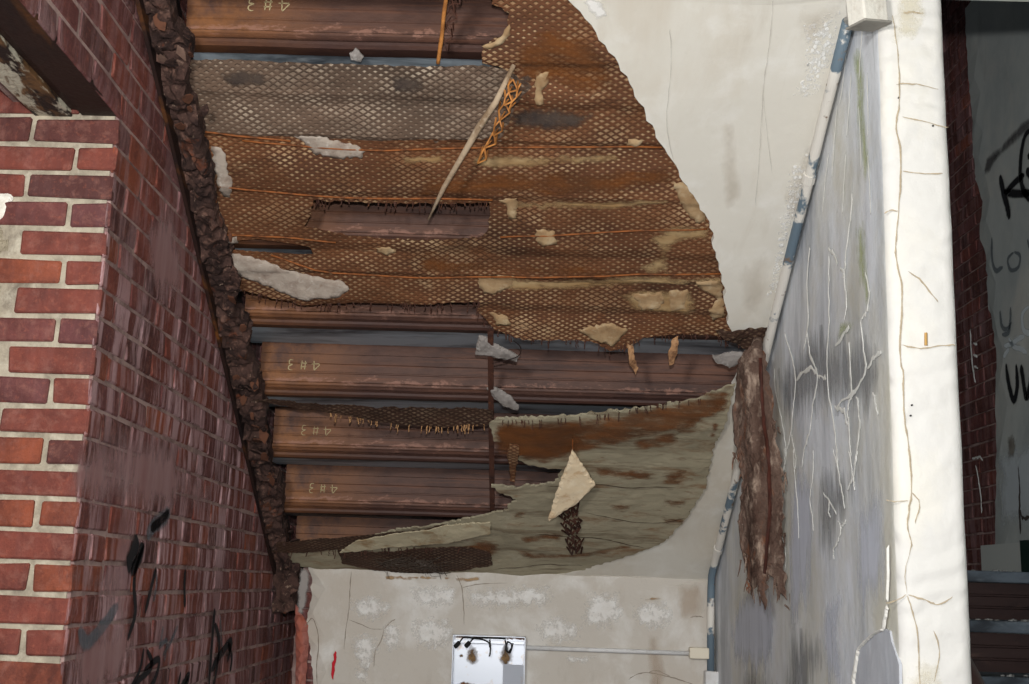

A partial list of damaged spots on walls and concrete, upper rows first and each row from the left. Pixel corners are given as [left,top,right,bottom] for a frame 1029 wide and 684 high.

corrosion [520,33,610,89]
damp [785,339,876,408]
crack [774,11,955,683]
corrosion [497,392,727,463]
damp [792,477,844,612]